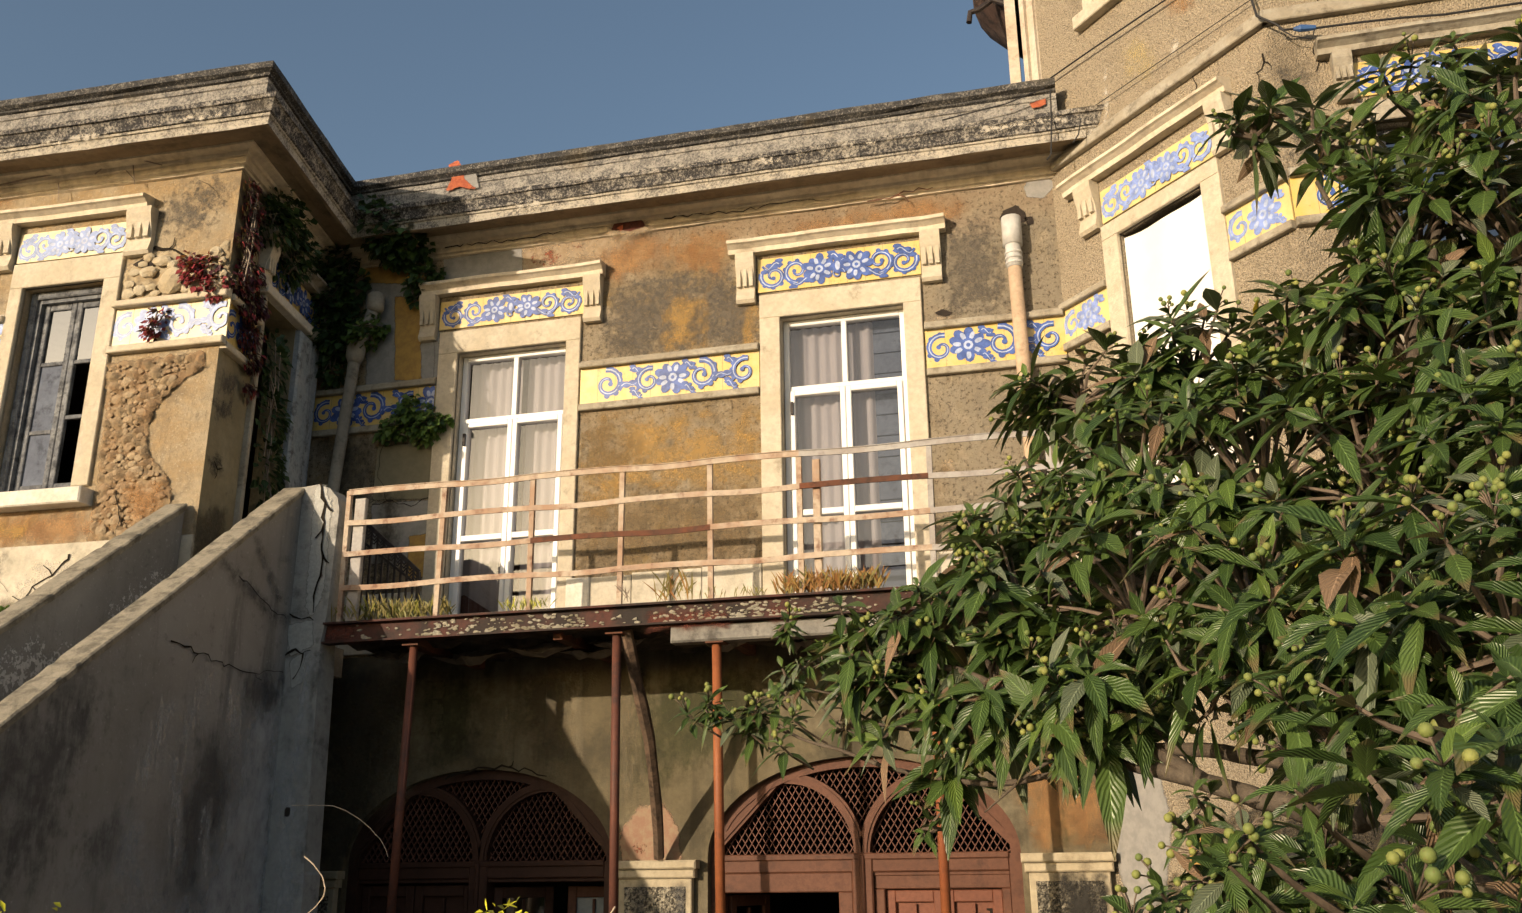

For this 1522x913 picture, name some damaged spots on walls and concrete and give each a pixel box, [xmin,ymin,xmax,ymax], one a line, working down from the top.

spalling [122,240,232,300]
flaking render [87,350,205,542]
crack [0,554,70,600]
crack [171,483,332,680]
corrosion [648,611,729,630]
damp [172,679,277,913]